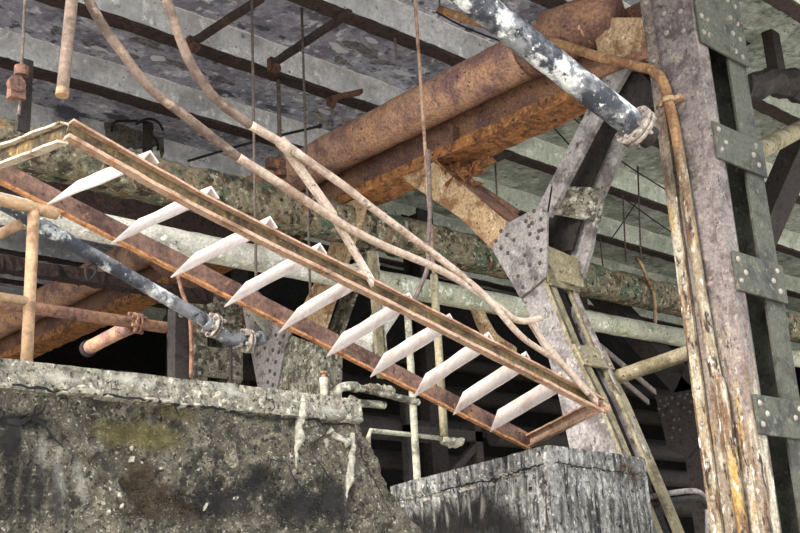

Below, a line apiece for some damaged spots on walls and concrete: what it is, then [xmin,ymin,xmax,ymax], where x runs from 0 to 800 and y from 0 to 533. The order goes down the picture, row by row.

crack [7,384,647,517]